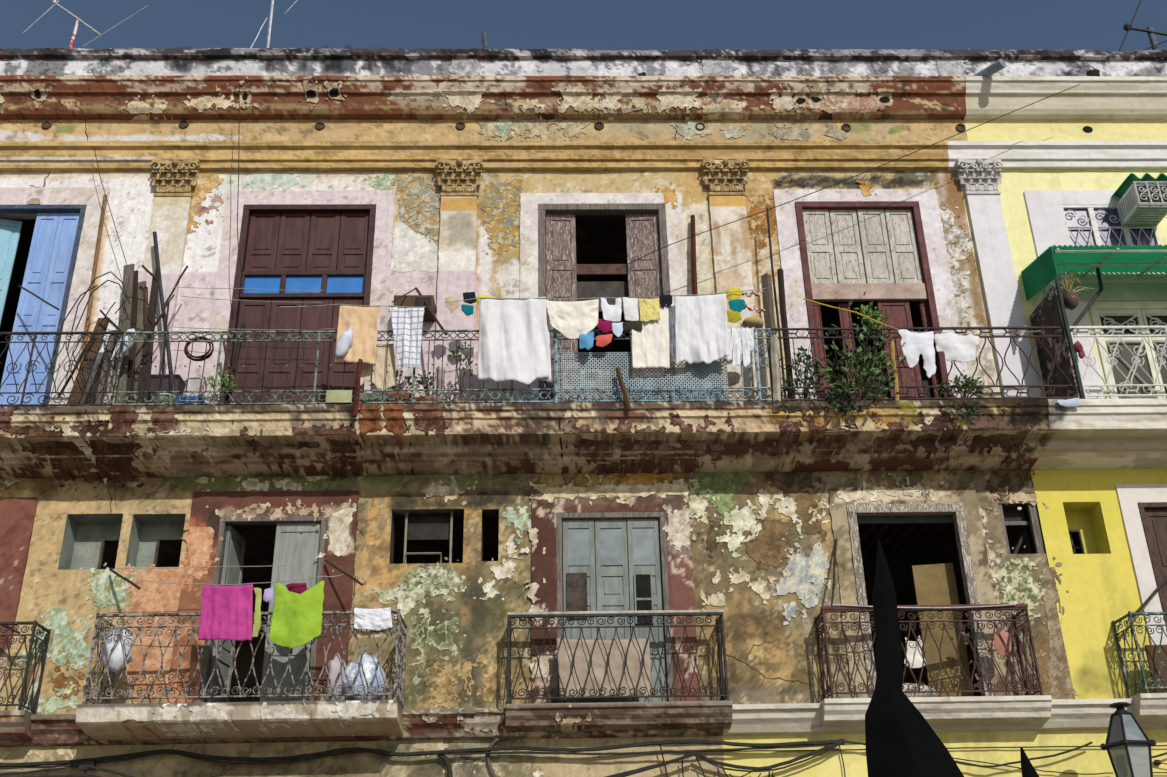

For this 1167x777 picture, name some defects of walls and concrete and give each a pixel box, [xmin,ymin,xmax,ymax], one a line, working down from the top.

hole [29,76,56,110]
peeling [118,77,259,120]
hole [297,75,348,110]
peeling [434,45,894,141]
peeling [187,171,225,235]
peeling [243,171,302,190]
peeling [477,174,524,265]
peeling [941,205,977,336]
peeling [12,419,368,745]
spalling [371,400,1078,742]
peeling [329,700,394,742]
peeling [413,740,502,777]